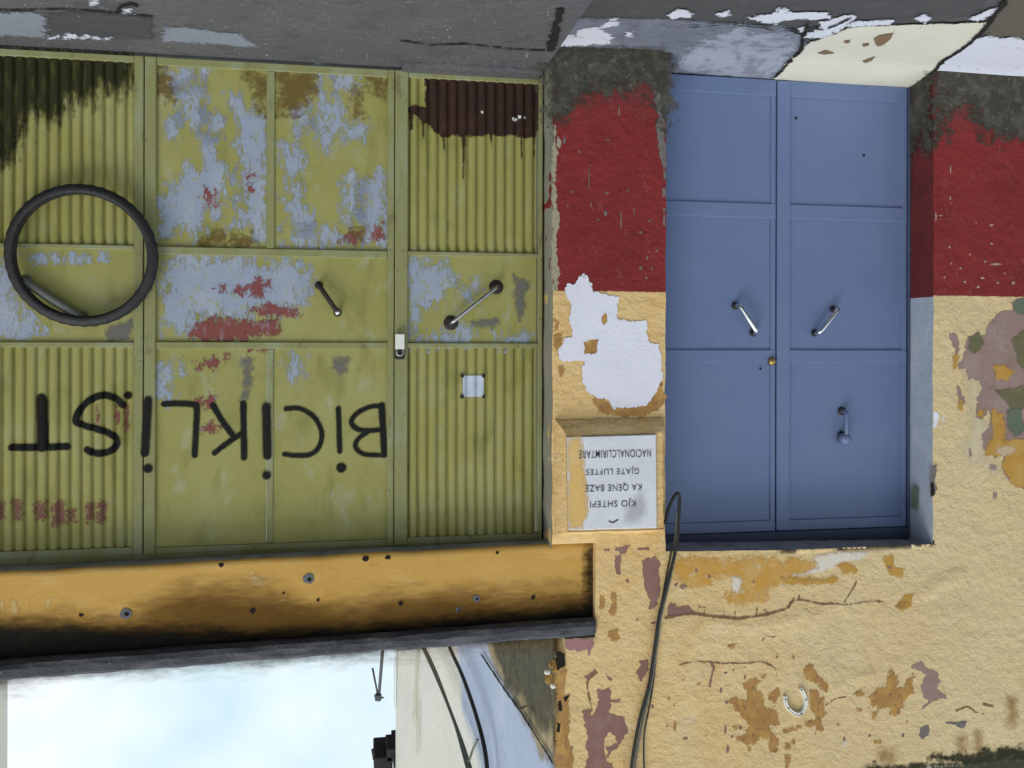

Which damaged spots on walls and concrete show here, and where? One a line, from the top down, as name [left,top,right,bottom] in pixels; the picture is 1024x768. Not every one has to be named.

water stain [0,45,134,169]
corrosion [408,76,541,178]
water stain [534,46,679,138]
water stain [909,68,1024,158]
peeling [156,65,395,341]
peeling [949,298,1024,489]
water stain [0,548,593,660]
peeling [604,545,858,624]
crack [664,581,884,688]
peeling [487,638,628,768]
peeling [720,663,829,768]
peeling [856,661,947,739]